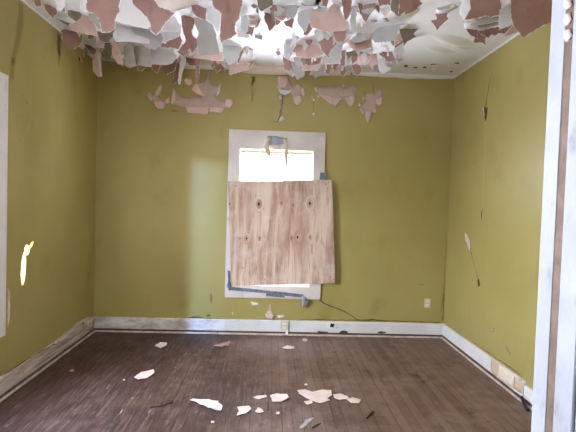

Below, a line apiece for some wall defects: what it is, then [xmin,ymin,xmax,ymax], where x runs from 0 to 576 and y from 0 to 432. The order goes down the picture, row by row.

peeling [431,0,552,45]
peeling [33,0,438,123]
crack [482,81,490,127]